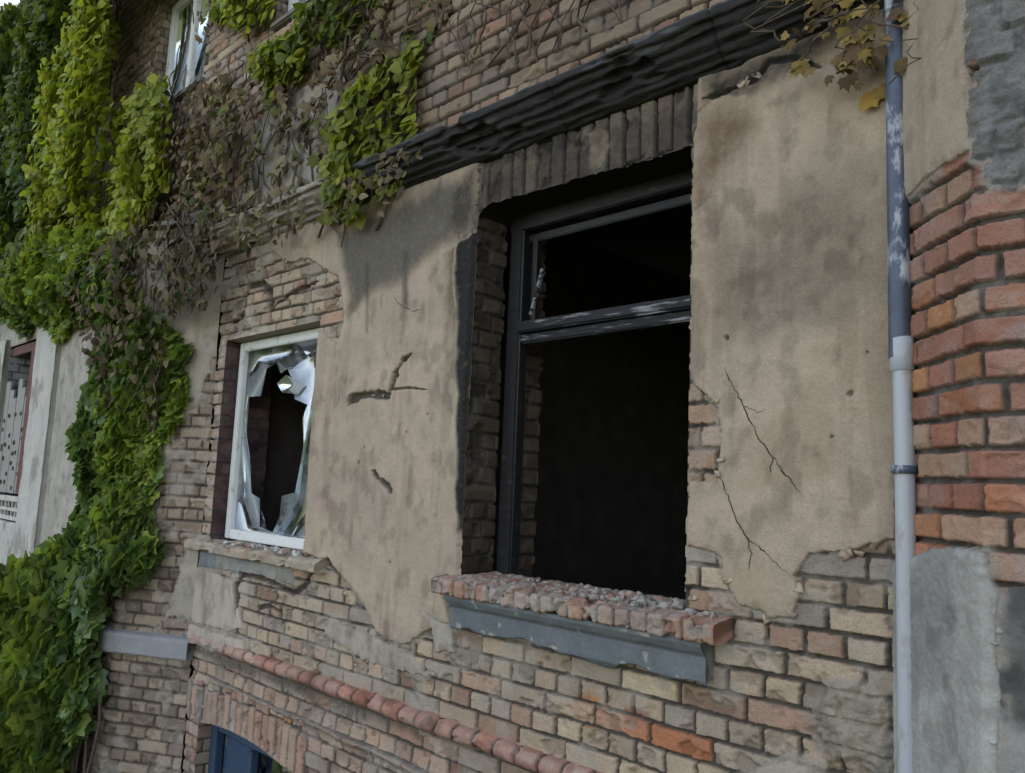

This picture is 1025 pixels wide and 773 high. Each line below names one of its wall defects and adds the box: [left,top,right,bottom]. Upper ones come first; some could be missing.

crack [349,352,427,403]
crack [725,369,803,496]
crack [719,477,786,572]
flaking render [685,540,898,773]
peeling [909,545,1003,773]